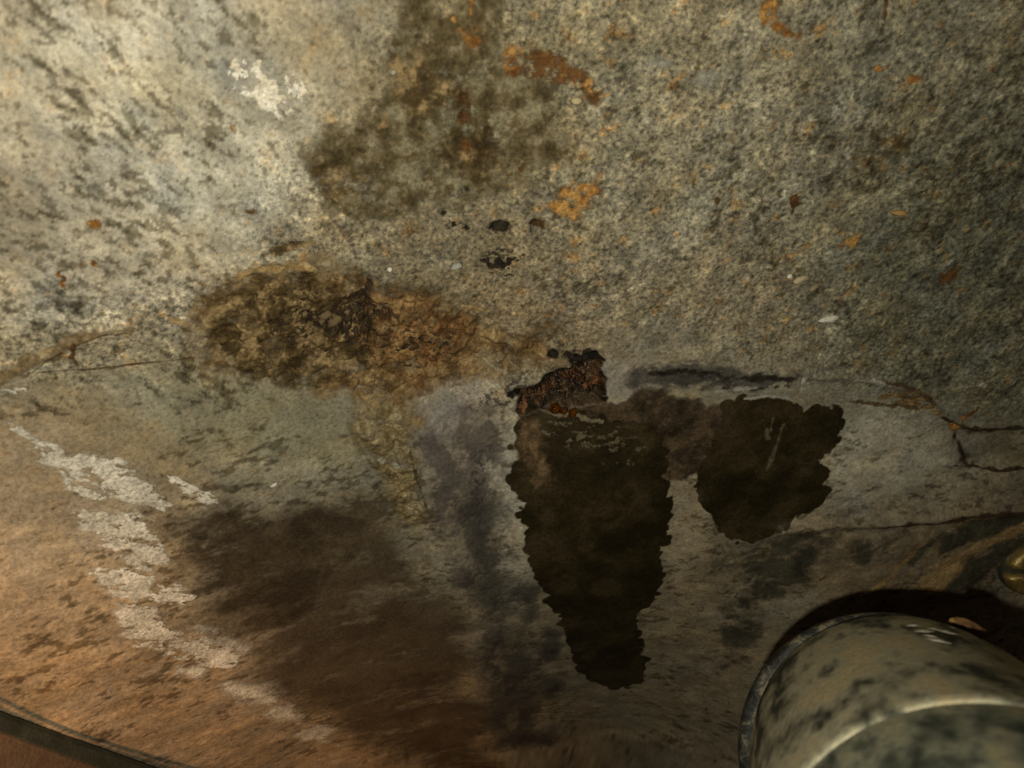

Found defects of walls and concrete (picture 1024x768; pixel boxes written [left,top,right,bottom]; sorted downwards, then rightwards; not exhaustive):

rust [503,47,600,105]
leakage [300,0,566,230]
rust [548,173,602,221]
leakage [476,249,525,277]
spalling [168,240,608,428]
crack [941,407,1024,472]
leakage [6,361,846,768]